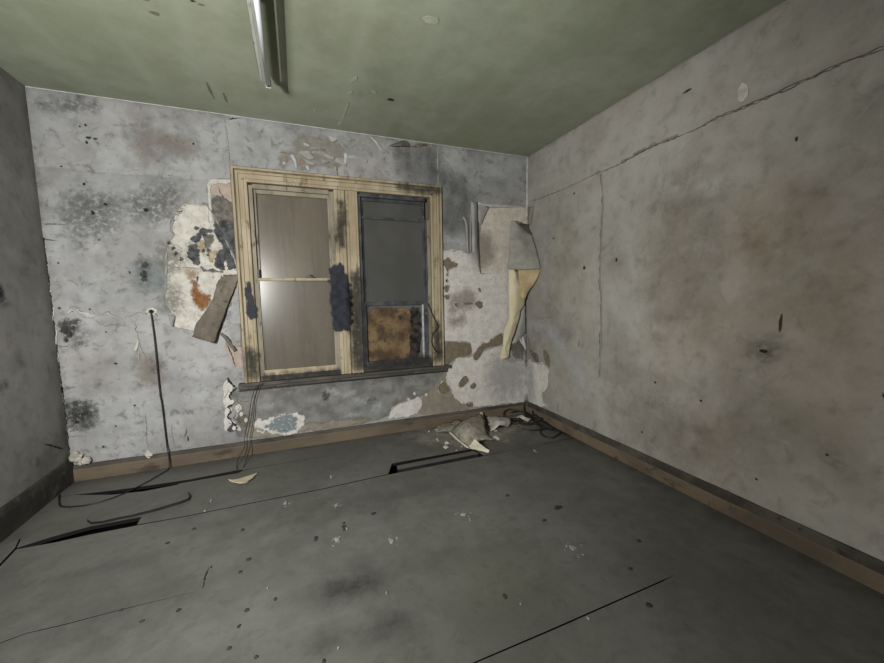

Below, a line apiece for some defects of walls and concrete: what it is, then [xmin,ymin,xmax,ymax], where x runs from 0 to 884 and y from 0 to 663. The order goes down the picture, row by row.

flaking render [166,178,237,331]
rust [188,270,211,311]
water stain [58,319,79,342]
flaking render [228,213,550,437]
water stain [65,401,91,427]